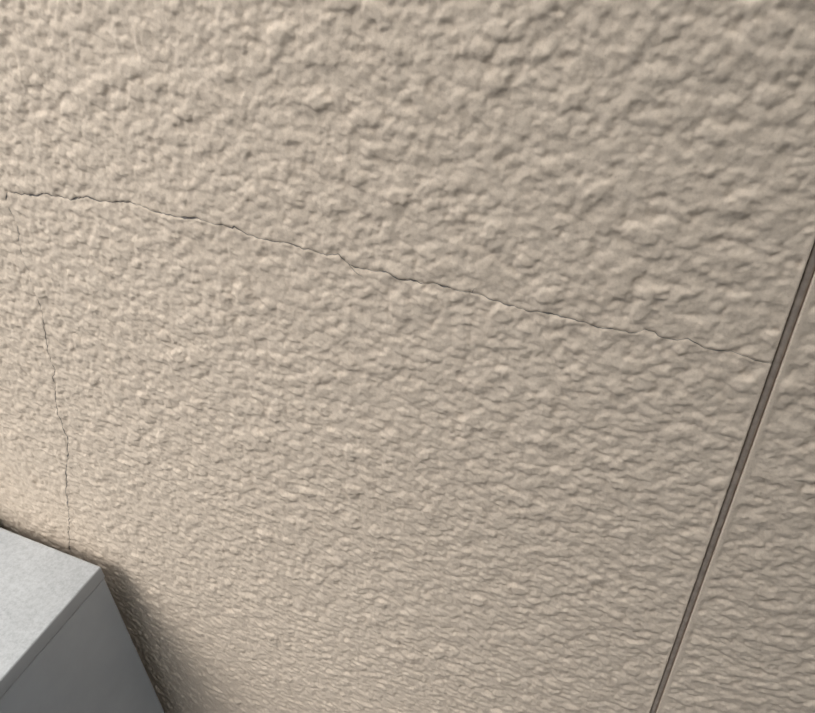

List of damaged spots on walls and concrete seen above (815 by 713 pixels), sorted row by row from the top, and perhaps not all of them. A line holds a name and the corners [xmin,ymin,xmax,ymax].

crack [6,192,766,363]